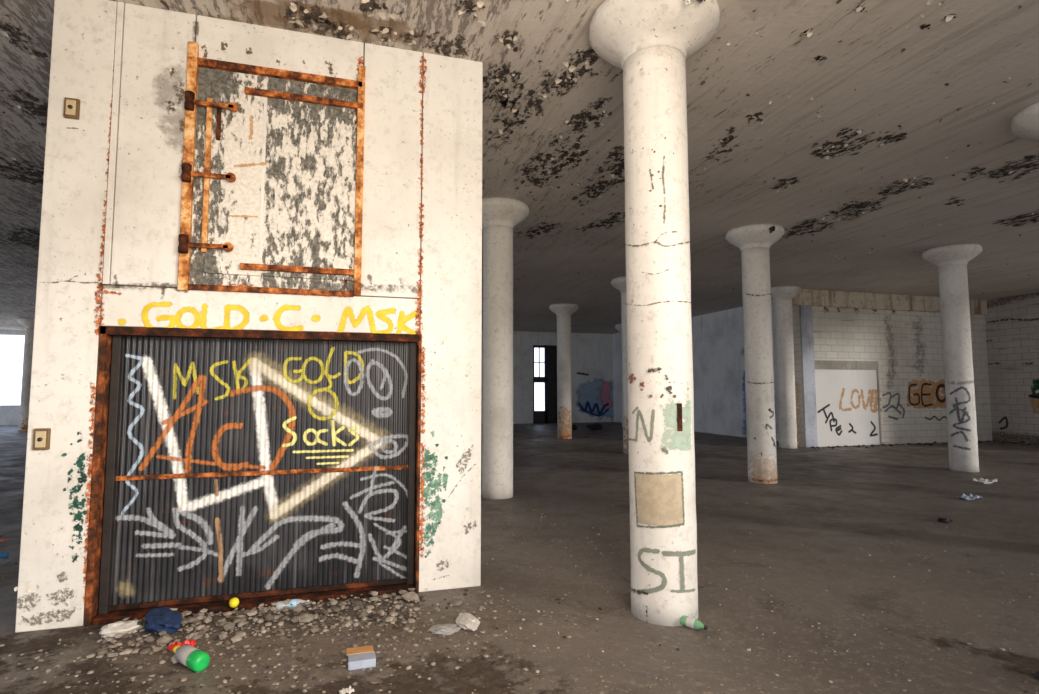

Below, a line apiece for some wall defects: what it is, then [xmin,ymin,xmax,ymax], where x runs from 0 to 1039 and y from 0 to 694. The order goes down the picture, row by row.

peeling [455,0,486,27]
peeling [495,30,519,52]
corrosion [94,95,121,335]
corrosion [419,56,427,190]
peeling [483,47,625,211]
peeling [517,208,625,245]
peeling [764,168,934,249]
peeling [810,125,907,159]
peeling [951,155,1039,183]
corrosion [415,203,425,557]
corrosion [558,407,572,439]
corrosion [83,383,97,602]